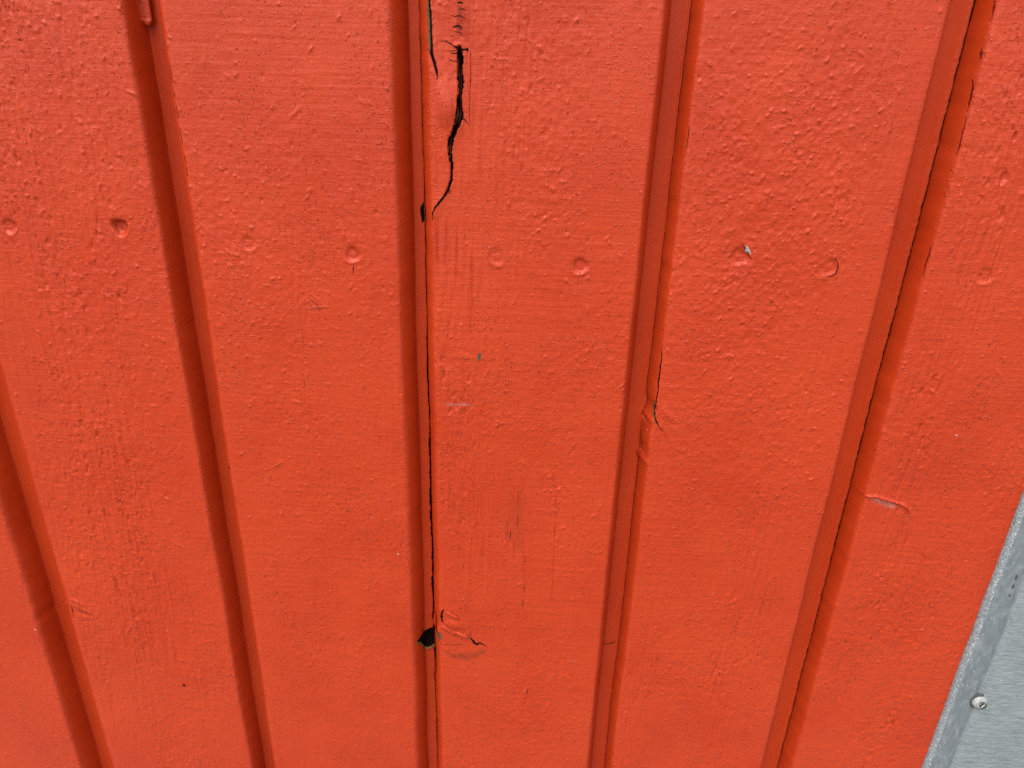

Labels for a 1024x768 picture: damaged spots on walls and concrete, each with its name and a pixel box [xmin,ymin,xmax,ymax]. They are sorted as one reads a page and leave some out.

crack [420,0,471,220]
crack [653,347,666,437]